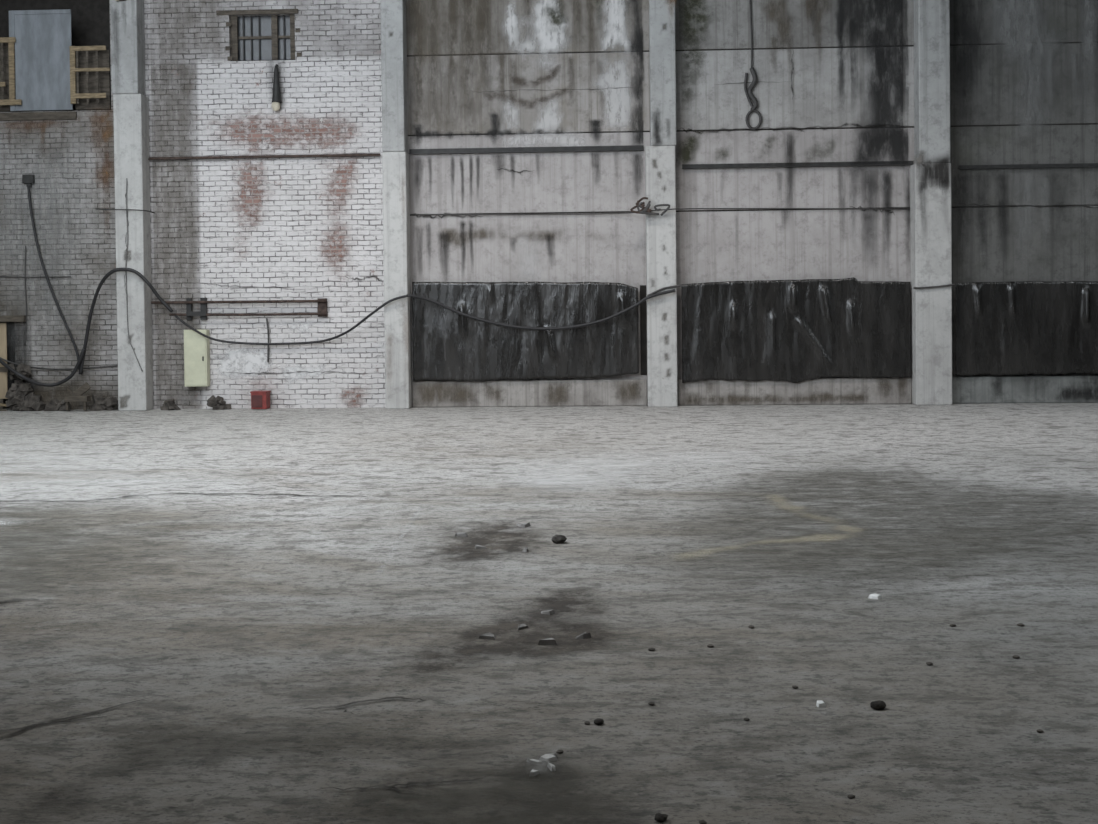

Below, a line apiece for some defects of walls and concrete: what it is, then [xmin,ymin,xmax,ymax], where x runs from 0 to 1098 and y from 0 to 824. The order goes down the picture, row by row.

leakage [452,158,479,191]
leakage [864,172,891,229]
leakage [441,222,486,259]
crack [0,699,143,737]